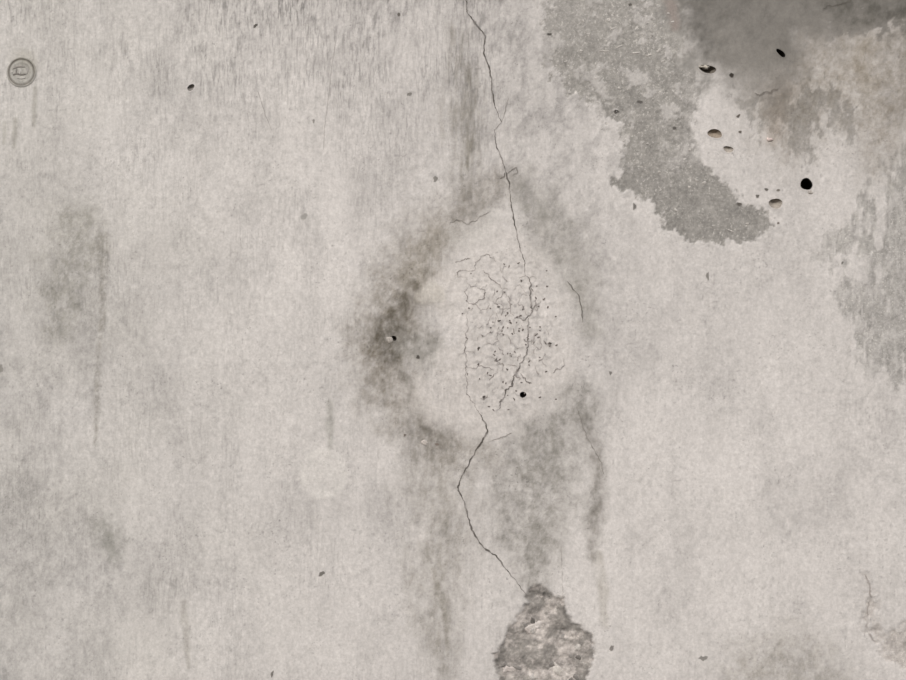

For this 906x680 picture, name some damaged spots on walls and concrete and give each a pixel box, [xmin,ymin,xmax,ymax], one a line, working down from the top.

leakage [323,17,620,680]
crack [455,0,583,594]
peeling [523,0,906,422]
leakage [661,0,906,115]
spalling [491,582,597,680]